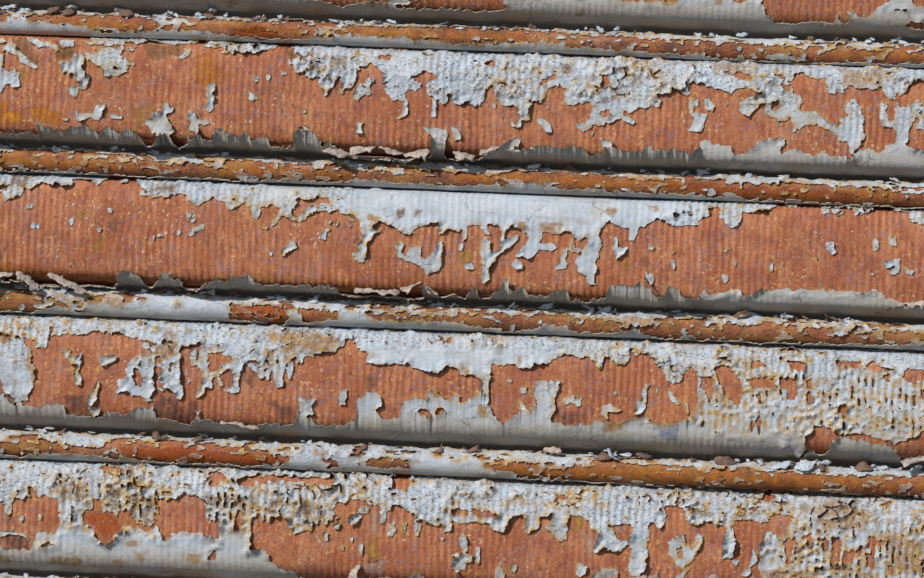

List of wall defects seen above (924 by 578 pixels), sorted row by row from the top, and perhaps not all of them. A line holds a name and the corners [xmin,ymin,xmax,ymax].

rust [15,39,38,63]
rust [450,170,891,200]
rust [233,305,285,322]
rust [156,332,177,359]
rust [264,331,340,365]
peeling [0,270,924,578]
rust [129,495,153,522]
rust [803,502,868,529]
rust [882,535,924,571]